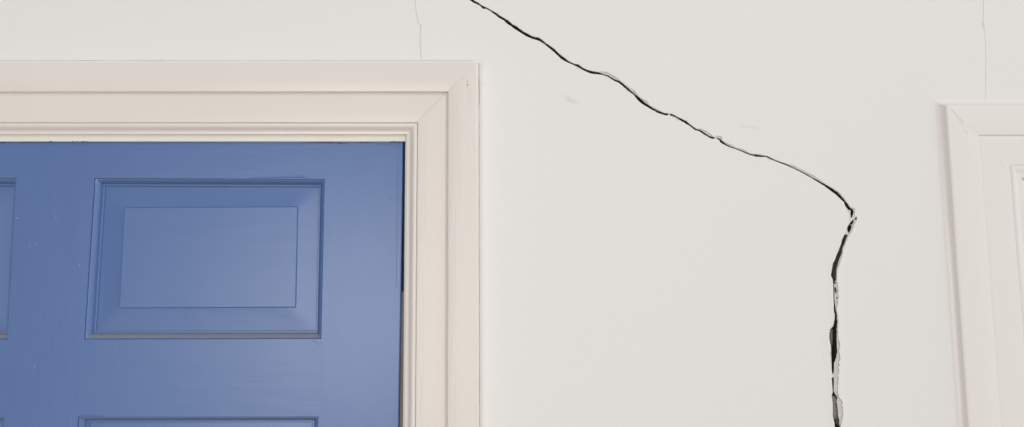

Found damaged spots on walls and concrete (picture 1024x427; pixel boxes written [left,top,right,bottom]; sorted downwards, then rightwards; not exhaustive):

crack [470,0,861,427]